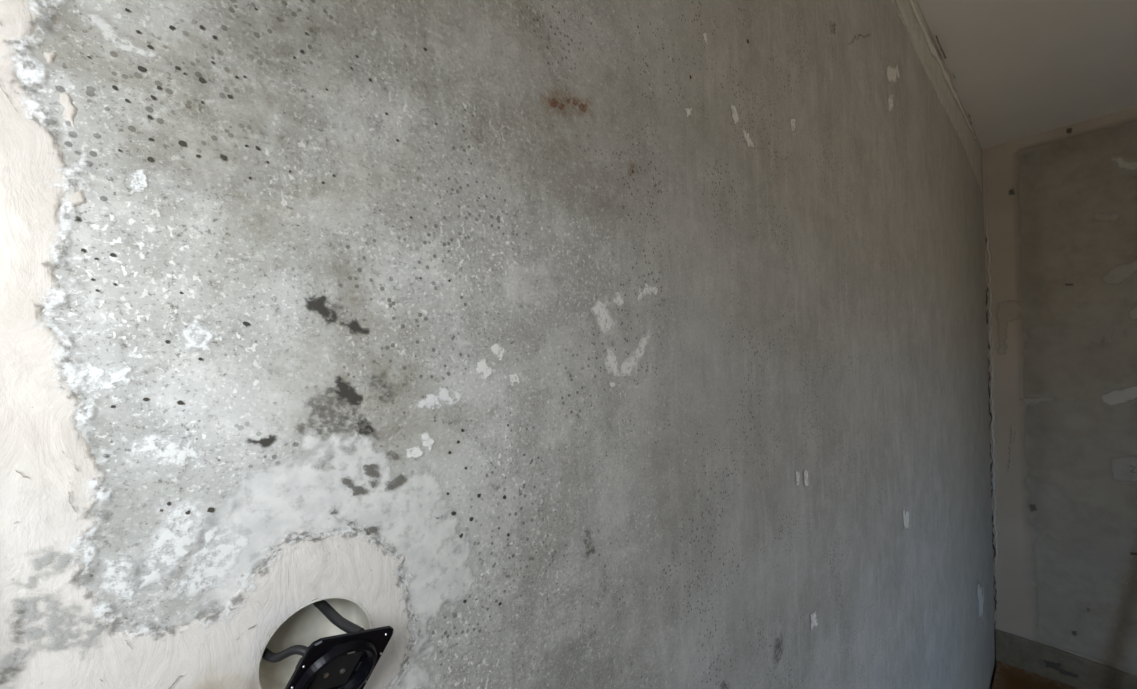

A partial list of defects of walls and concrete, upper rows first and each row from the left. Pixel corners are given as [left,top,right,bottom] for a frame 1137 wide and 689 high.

leakage [306,296,369,334]
flaking render [0,0,419,689]
leakage [298,377,373,434]
leakage [248,435,275,447]